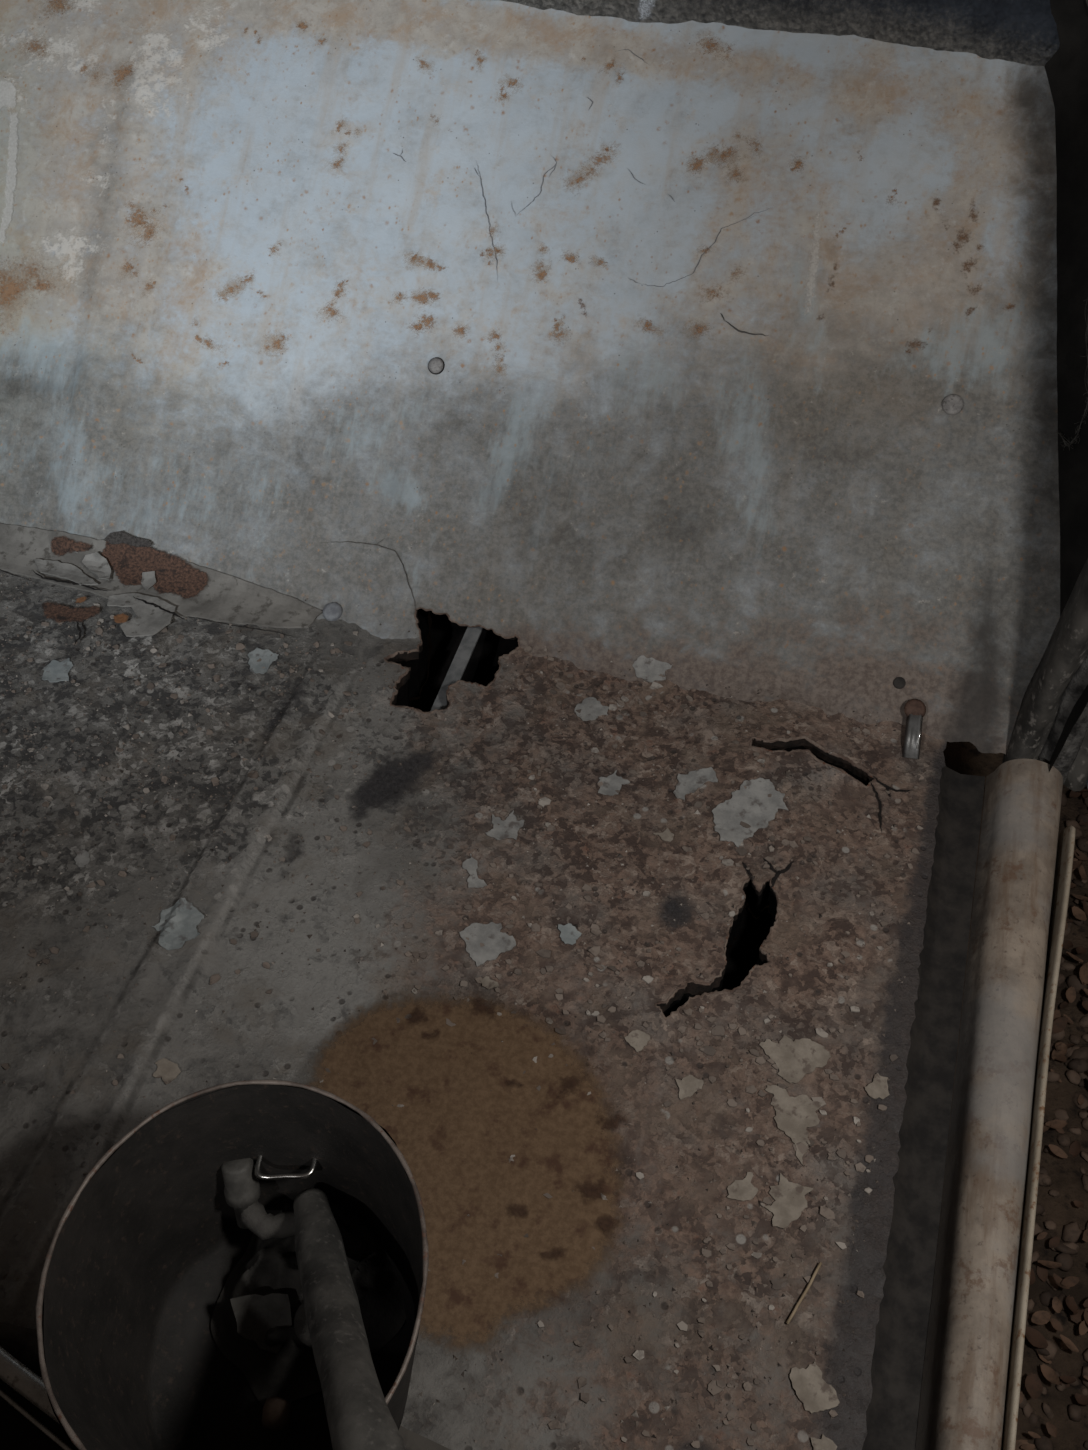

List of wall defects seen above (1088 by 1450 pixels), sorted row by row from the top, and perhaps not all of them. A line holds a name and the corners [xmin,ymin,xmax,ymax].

corrosion [396,292,439,331]
peeling [33,531,208,646]
spalling [387,609,519,712]
crack [749,736,910,830]